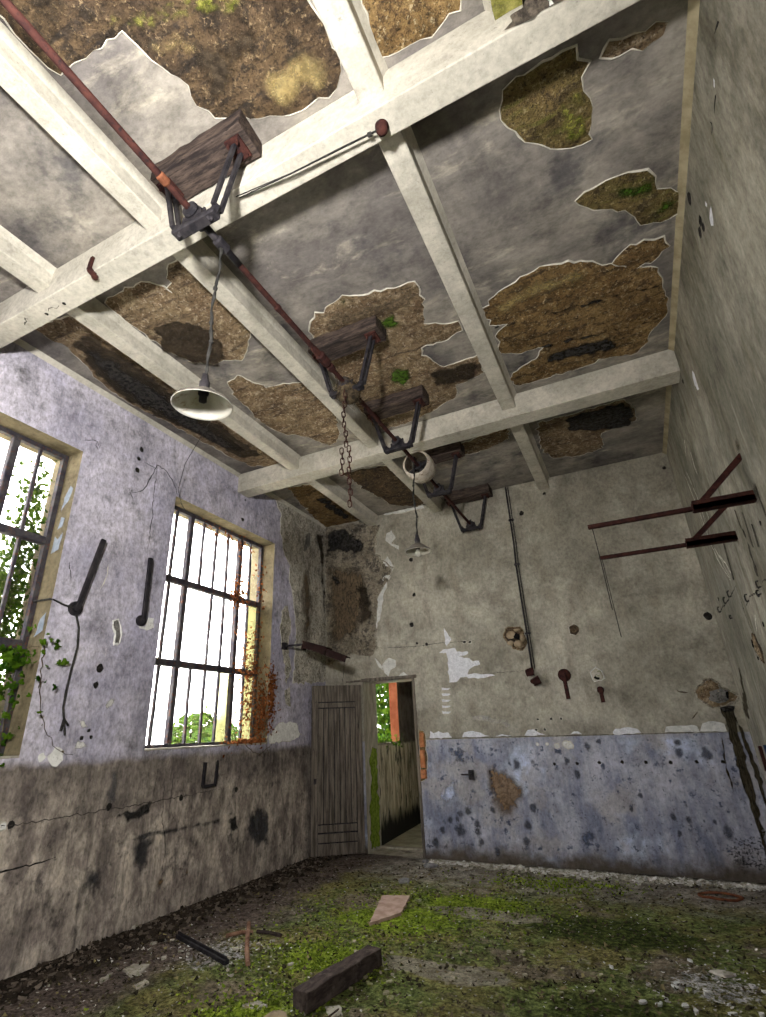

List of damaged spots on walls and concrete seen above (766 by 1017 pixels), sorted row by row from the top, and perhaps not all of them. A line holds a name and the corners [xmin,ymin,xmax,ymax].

peeling [0,0,341,119]
peeling [361,0,462,58]
peeling [499,21,668,150]
peeling [575,168,679,226]
peeling [35,316,278,467]
peeling [104,259,251,366]
peeling [227,375,340,446]
peeling [308,281,484,429]
peeling [482,235,670,386]
peeling [535,399,637,458]
water stain [702,739,733,788]
water stain [713,716,766,870]